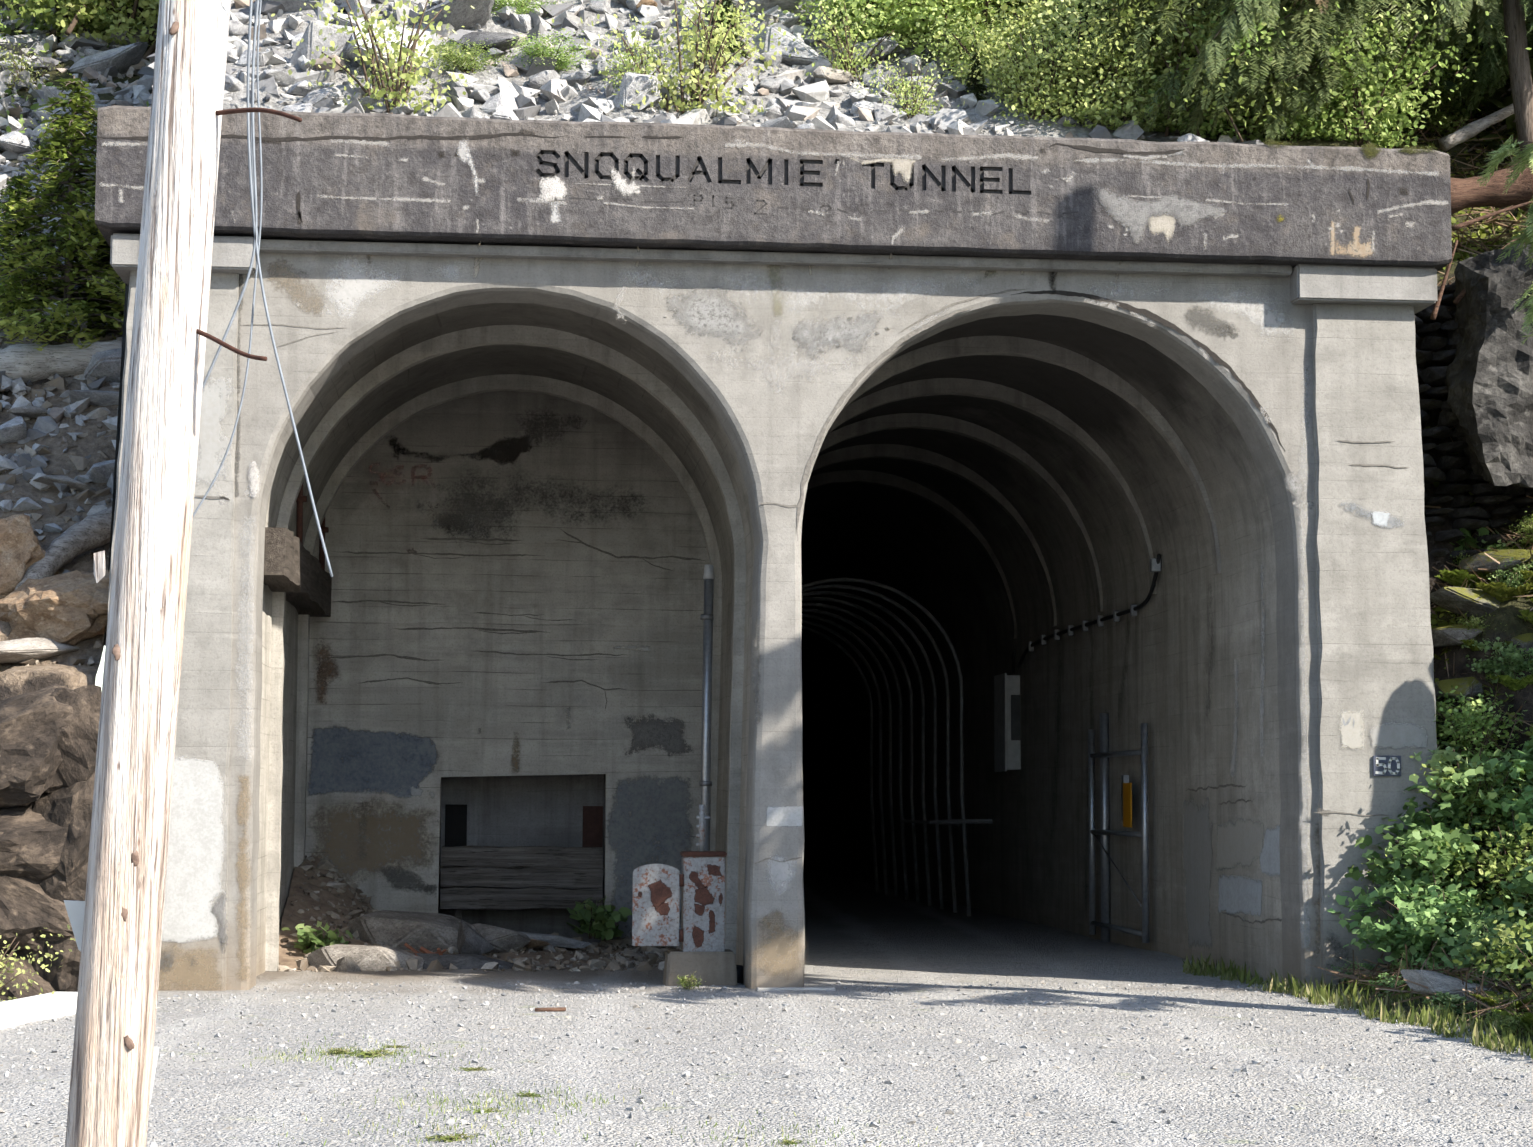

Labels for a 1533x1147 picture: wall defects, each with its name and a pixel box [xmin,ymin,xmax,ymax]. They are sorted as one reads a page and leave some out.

spalling [518,175,567,222]
spalling [1090,187,1225,243]
damp [390,436,444,462]
damp [434,410,642,538]
crack [331,528,704,571]
corrosion [315,644,338,704]
crack [330,600,627,709]